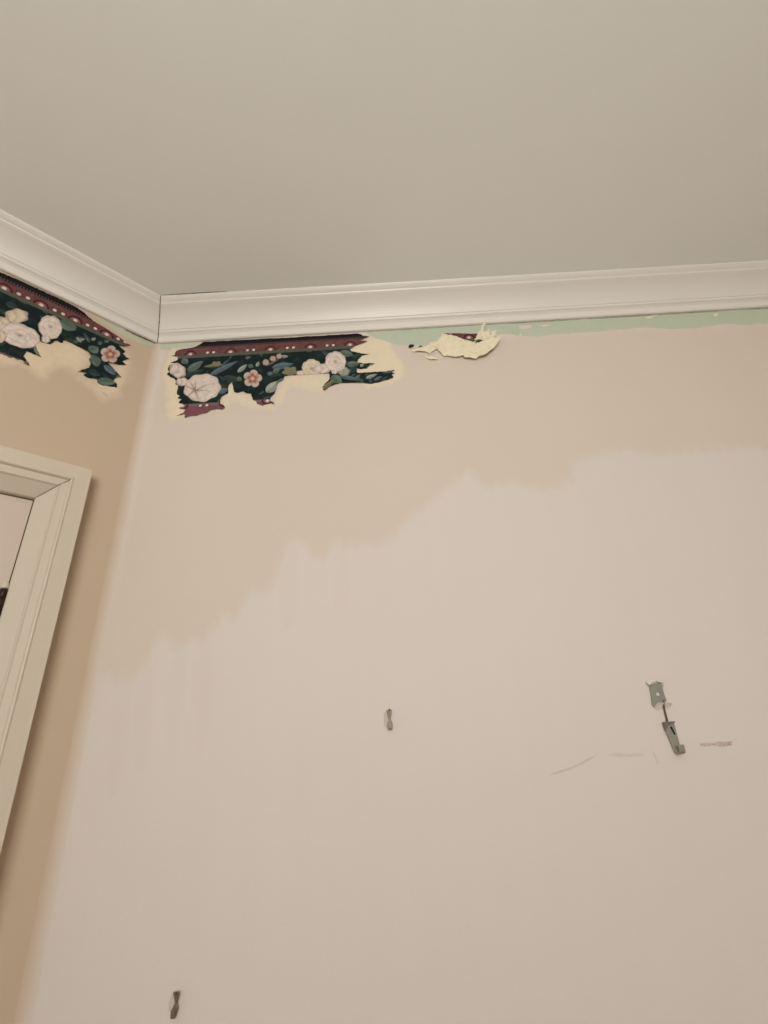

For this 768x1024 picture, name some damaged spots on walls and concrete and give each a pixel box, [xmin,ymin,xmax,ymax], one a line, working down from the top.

peeling [367,309,768,346]